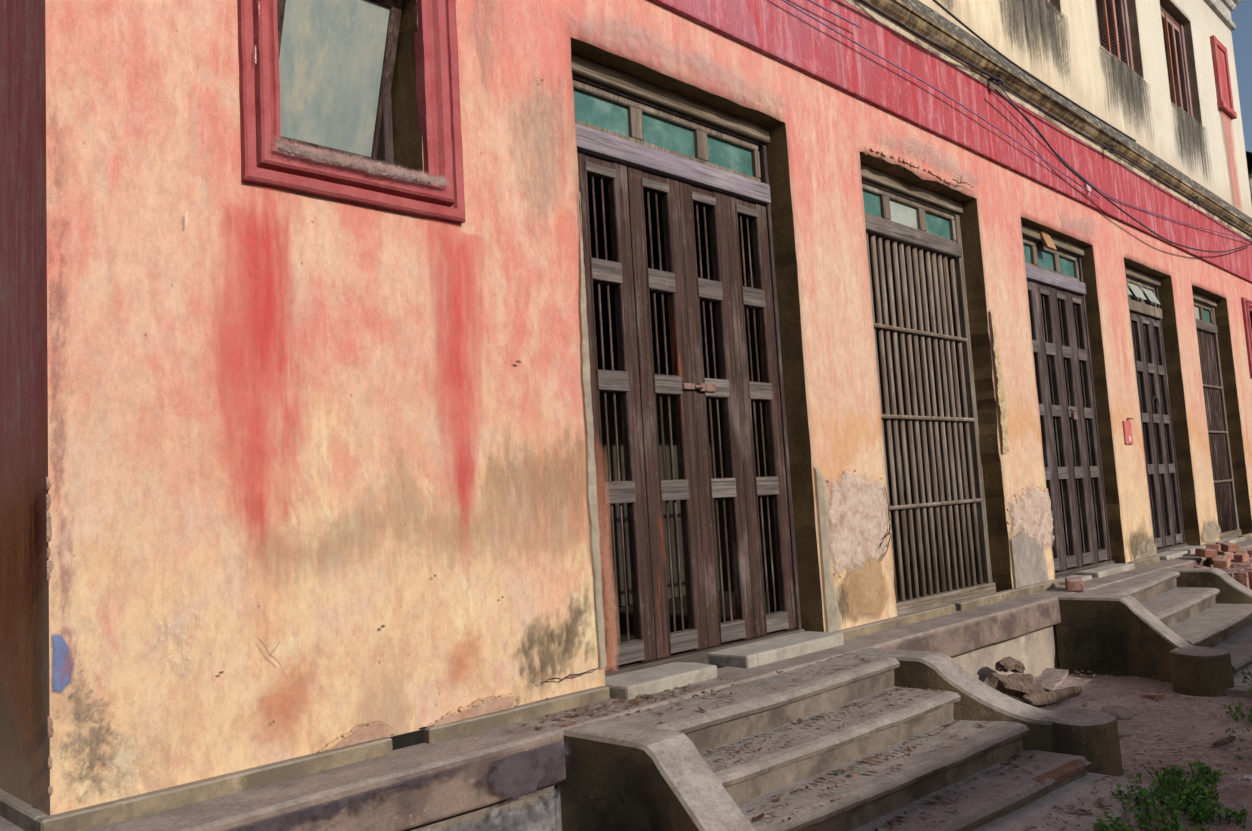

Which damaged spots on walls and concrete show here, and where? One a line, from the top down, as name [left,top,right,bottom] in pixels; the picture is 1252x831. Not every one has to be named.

damp [1002,0,1071,79]
damp [1101,46,1154,136]
damp [1174,102,1211,178]
spalling [826,470,891,577]
spalling [1007,486,1054,548]
damp [519,596,590,687]
crack [540,667,599,683]